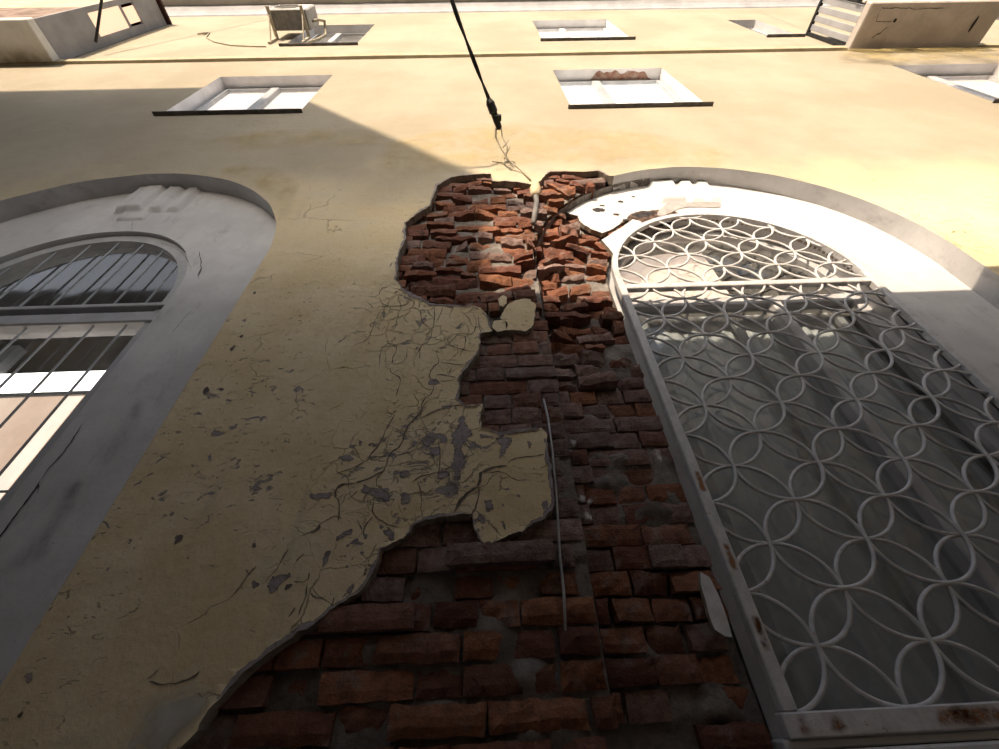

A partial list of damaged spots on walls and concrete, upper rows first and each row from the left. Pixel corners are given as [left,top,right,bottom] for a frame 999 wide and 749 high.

crack [872,7,940,38]
crack [232,287,481,616]
flaking render [177,170,773,749]
crack [453,454,544,520]
corrosion [939,708,999,724]